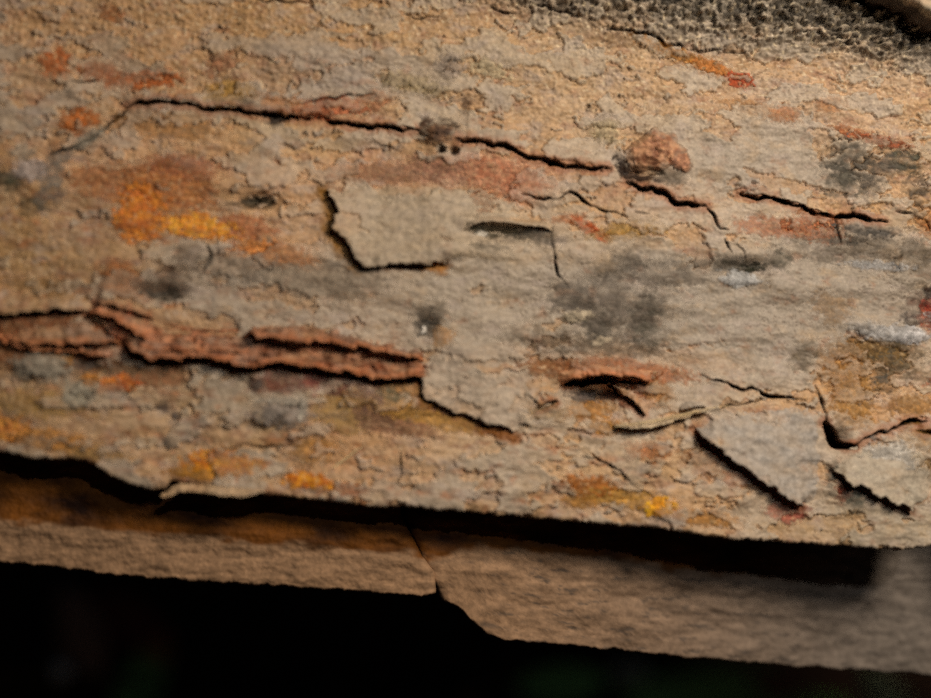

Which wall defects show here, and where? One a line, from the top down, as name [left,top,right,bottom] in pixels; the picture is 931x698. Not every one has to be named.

crack [50,93,419,155]
rust [60,154,282,259]
crack [456,138,745,254]
crack [739,194,931,244]
damp [817,133,931,206]
damp [521,249,793,357]
rust [0,266,821,524]
crack [540,374,649,414]
crack [700,374,931,449]
rust [822,338,909,421]
rust [831,442,931,512]
rust [687,509,730,527]